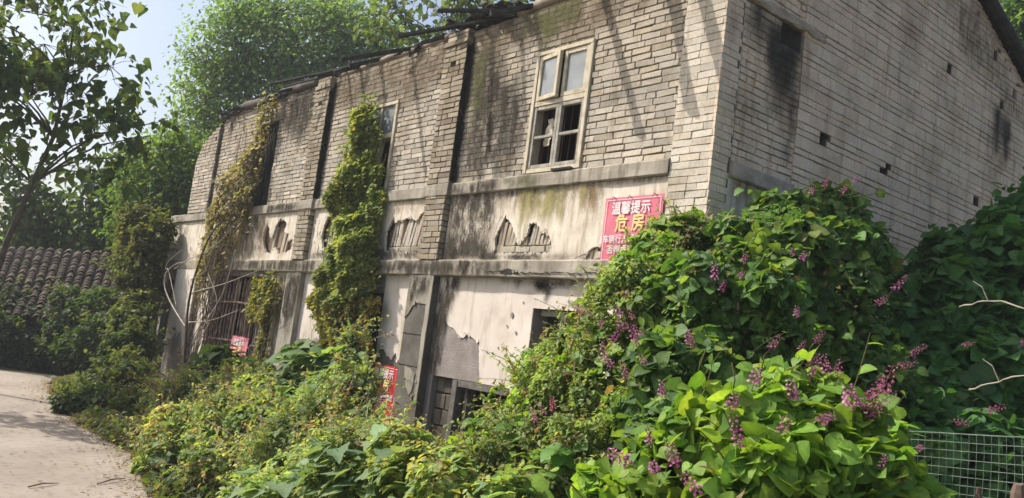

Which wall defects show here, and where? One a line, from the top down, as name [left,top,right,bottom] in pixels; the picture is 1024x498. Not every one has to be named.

leakage [996,111,1010,154]
leakage [371,0,615,374]
peeling [240,218,292,256]
peeling [384,213,424,254]
peeling [453,197,551,255]
peeling [376,275,479,404]